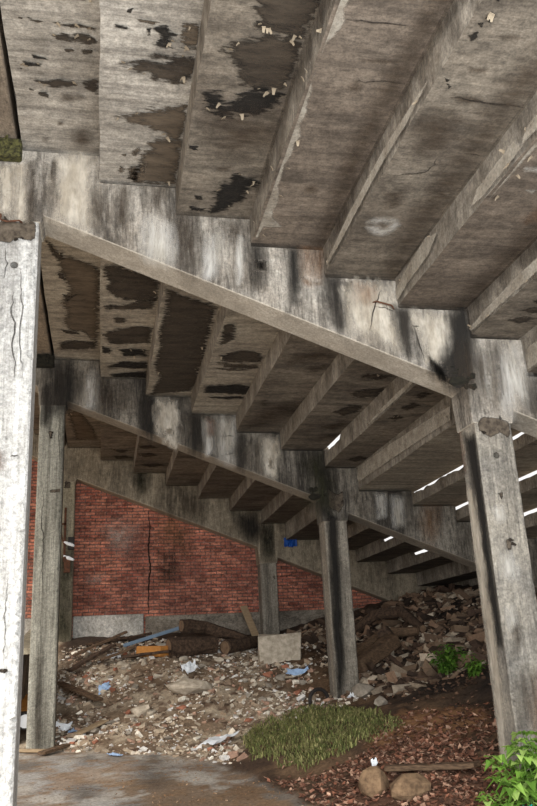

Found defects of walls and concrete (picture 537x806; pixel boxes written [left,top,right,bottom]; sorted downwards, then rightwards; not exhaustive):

peeling [29,78,99,98]
peeling [52,22,97,54]
peeling [115,104,198,186]
peeling [120,19,199,84]
peeling [201,0,348,237]
peeling [189,173,261,213]
crack [11,288,23,375]
peeling [46,241,218,447]
peeling [203,384,250,400]
peeling [217,324,263,371]
water stain [429,307,492,395]
crack [145,511,153,613]